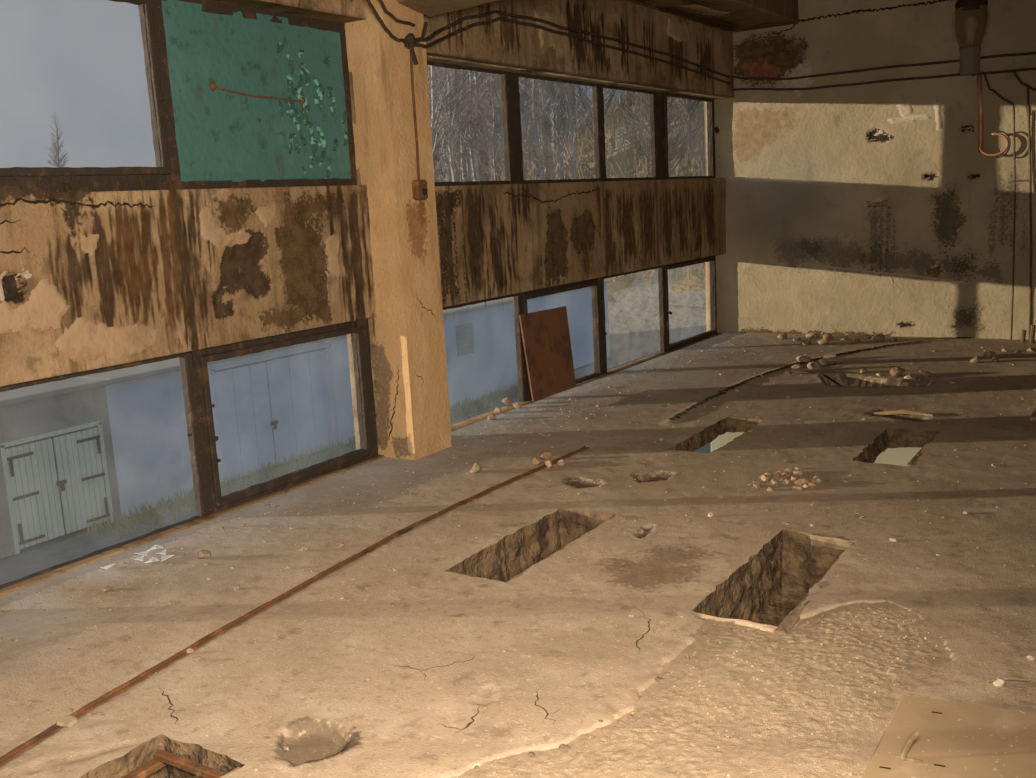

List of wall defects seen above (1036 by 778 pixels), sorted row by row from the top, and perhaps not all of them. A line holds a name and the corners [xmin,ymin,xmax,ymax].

crack [0,246,30,254]
crack [0,195,153,224]
peeling [79,234,100,256]
damp [0,180,211,365]
damp [213,193,257,234]
flaking render [199,202,289,319]
peeling [325,233,341,277]
damp [435,186,530,308]
damp [541,184,717,292]
damp [931,191,973,272]
peeling [0,268,159,363]
damp [954,307,983,327]